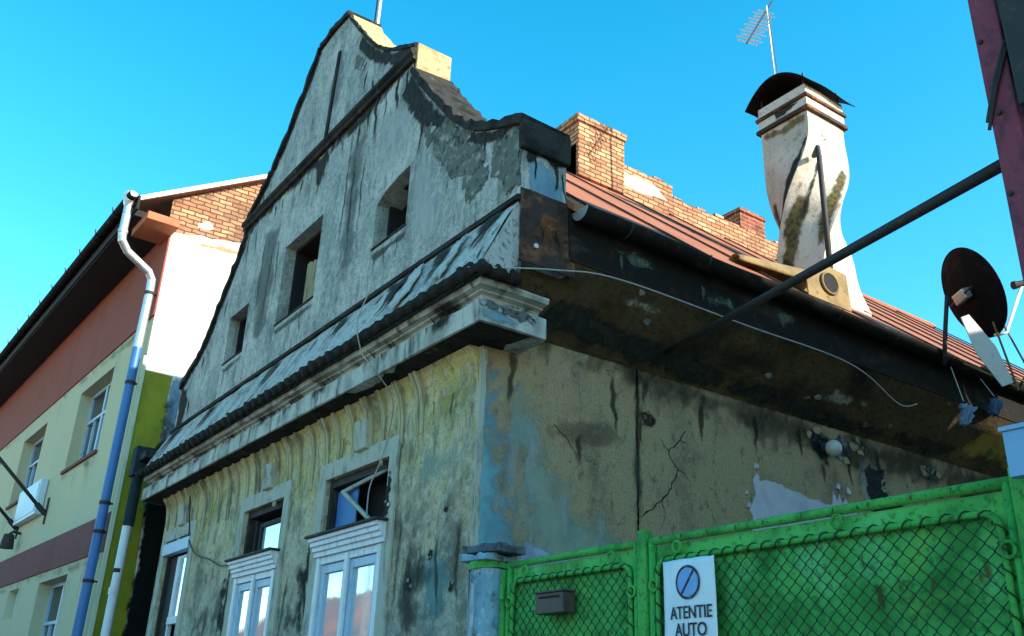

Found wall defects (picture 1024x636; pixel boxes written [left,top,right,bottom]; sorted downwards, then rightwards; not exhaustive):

flaking render [423,116,522,204]
water stain [156,37,514,456]
water stain [478,353,619,569]
crack [636,371,690,531]
water stain [624,365,712,502]
water stain [737,402,828,479]
peeling [745,426,905,531]
water stain [842,429,1008,498]
water stain [393,523,460,634]